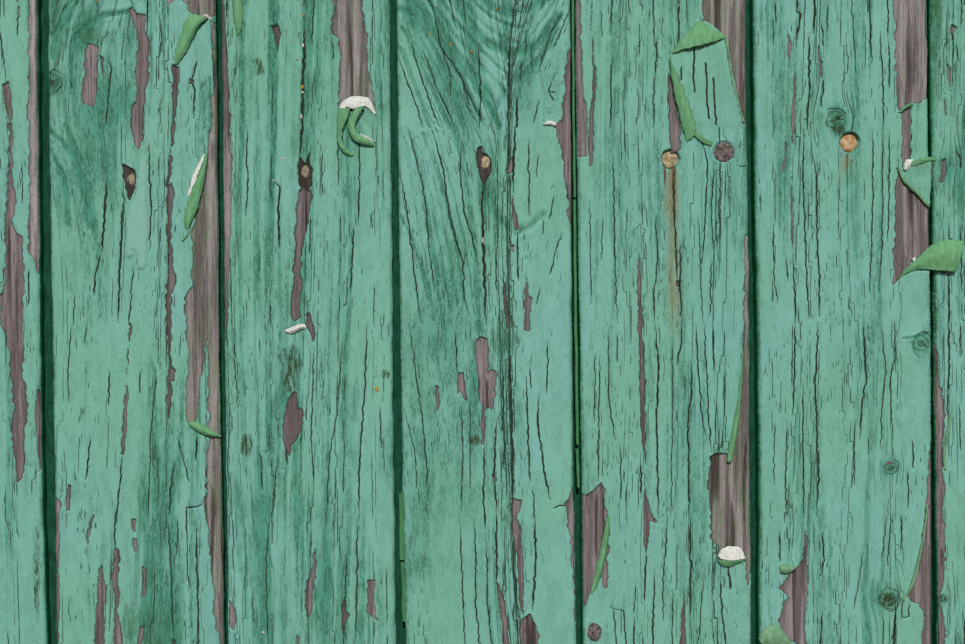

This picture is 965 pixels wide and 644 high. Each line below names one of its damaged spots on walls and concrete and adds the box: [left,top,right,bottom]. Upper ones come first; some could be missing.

crack [0,0,26,241]
peeling [0,0,42,483]
peeling [165,0,243,644]
crack [4,0,570,644]
peeling [285,153,316,341]
peeling [331,0,379,156]
peeling [564,483,610,627]
peeling [667,0,746,153]
peeling [707,235,751,585]
crack [583,0,921,644]
peeling [759,532,808,644]
peeling [892,0,964,644]